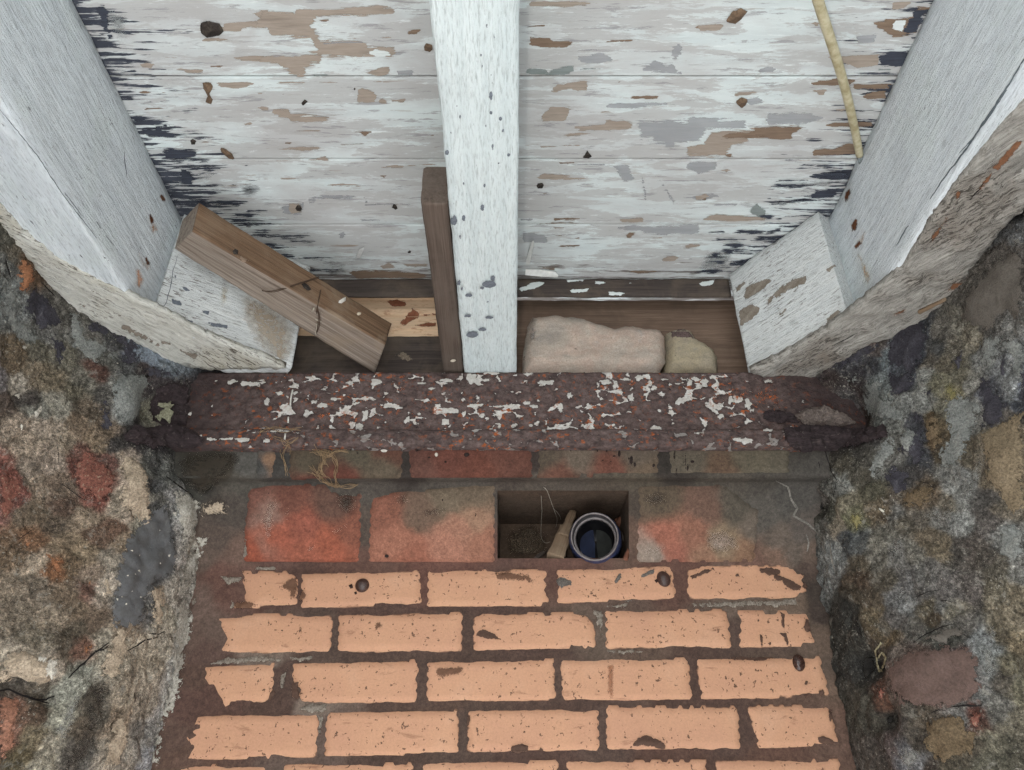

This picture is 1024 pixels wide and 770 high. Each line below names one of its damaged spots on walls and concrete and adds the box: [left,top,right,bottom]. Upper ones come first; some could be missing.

peeling [200,5,413,104]
peeling [529,25,572,48]
peeling [811,1,930,99]
peeling [540,95,872,174]
peeling [618,176,766,274]
peeling [1,262,198,364]
peeling [520,267,555,291]
peeling [567,280,623,296]
peeling [736,276,807,325]
peeling [215,379,266,387]
peeling [442,401,538,425]
peeling [675,377,754,419]